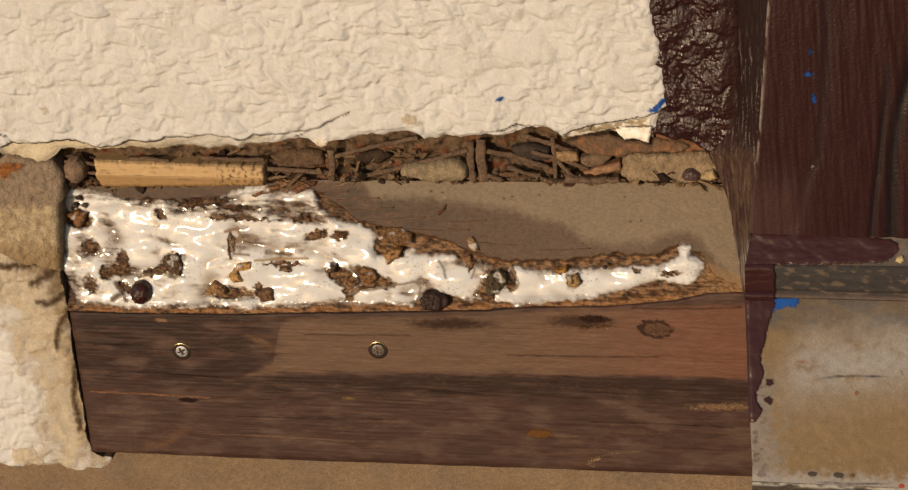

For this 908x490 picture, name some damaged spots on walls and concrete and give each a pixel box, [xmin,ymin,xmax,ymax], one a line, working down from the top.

spalling [563,118,652,143]
peeling [1,139,172,161]
leakage [29,269,56,287]
leakage [36,292,64,307]
leakage [54,313,67,349]
leakage [71,365,82,431]